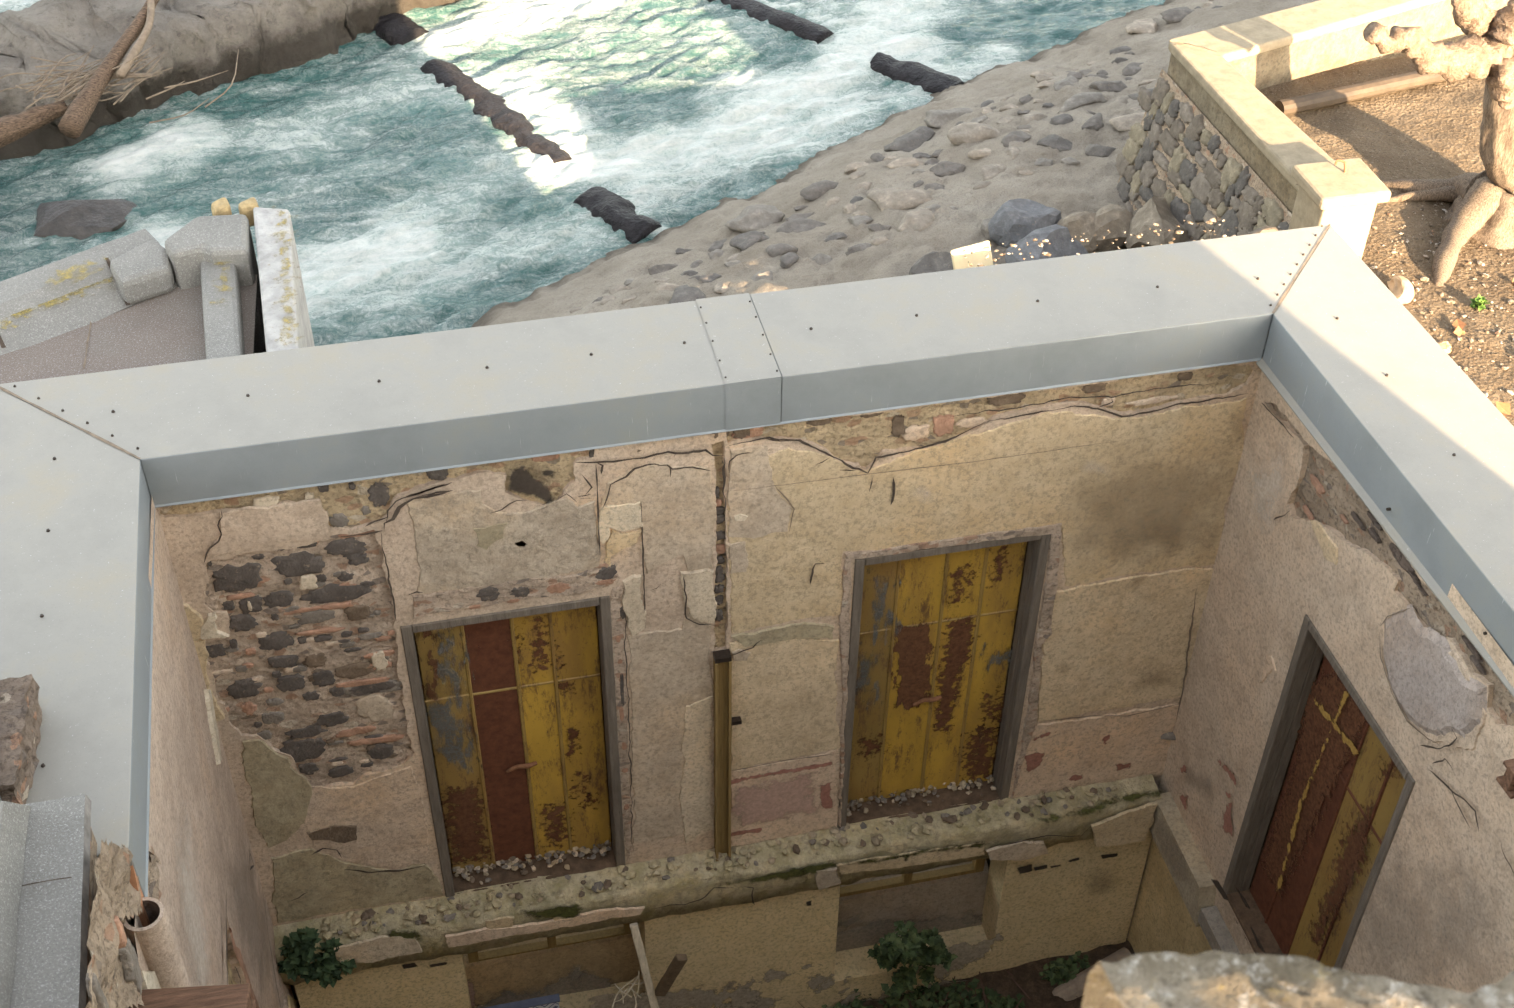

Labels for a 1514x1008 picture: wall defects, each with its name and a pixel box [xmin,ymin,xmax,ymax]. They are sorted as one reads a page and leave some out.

crack [204,511,223,563]
flaking render [159,364,1253,923]
crack [492,383,1294,851]
spalling [1271,403,1514,751]
spalling [85,838,162,1008]
flaking render [334,935,422,963]
flaking render [445,906,645,947]